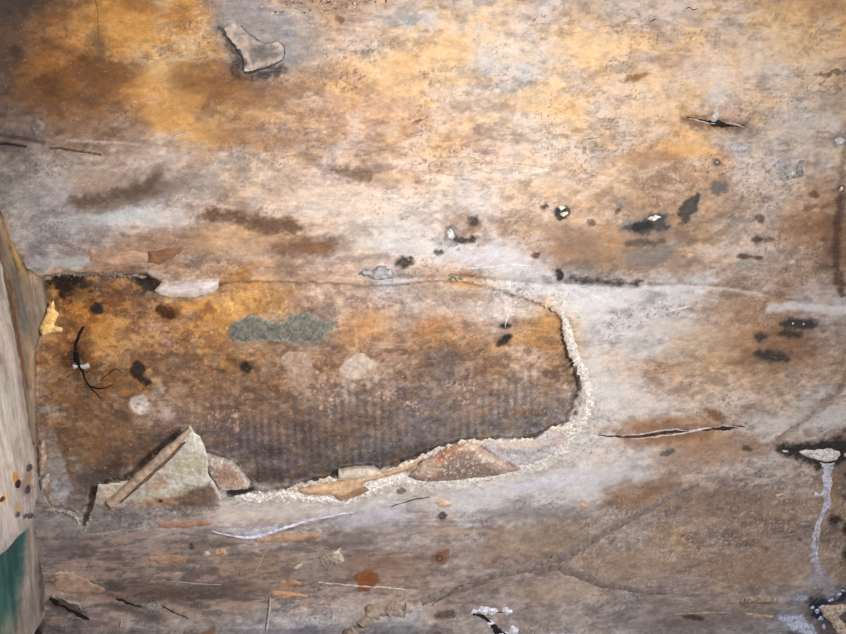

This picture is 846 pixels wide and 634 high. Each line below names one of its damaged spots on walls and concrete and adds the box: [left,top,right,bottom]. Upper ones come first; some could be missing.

spalling [224,23,286,74]
crack [687,105,745,130]
water stain [834,194,846,297]
peeling [155,278,219,298]
peeling [39,301,63,336]
peeling [228,312,339,342]
crack [599,424,745,443]
peeling [408,439,520,482]
peeling [84,425,250,536]